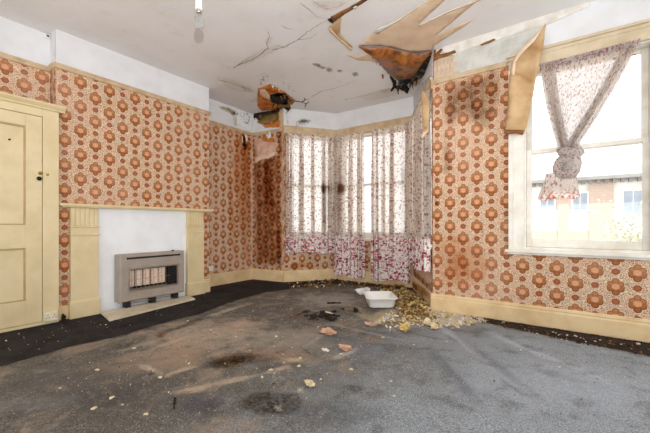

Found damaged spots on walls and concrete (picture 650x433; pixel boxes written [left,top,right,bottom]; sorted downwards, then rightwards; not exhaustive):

spalling [218,85,294,158]
crack [217,0,347,91]
peeling [421,76,431,139]
peeling [504,23,546,135]